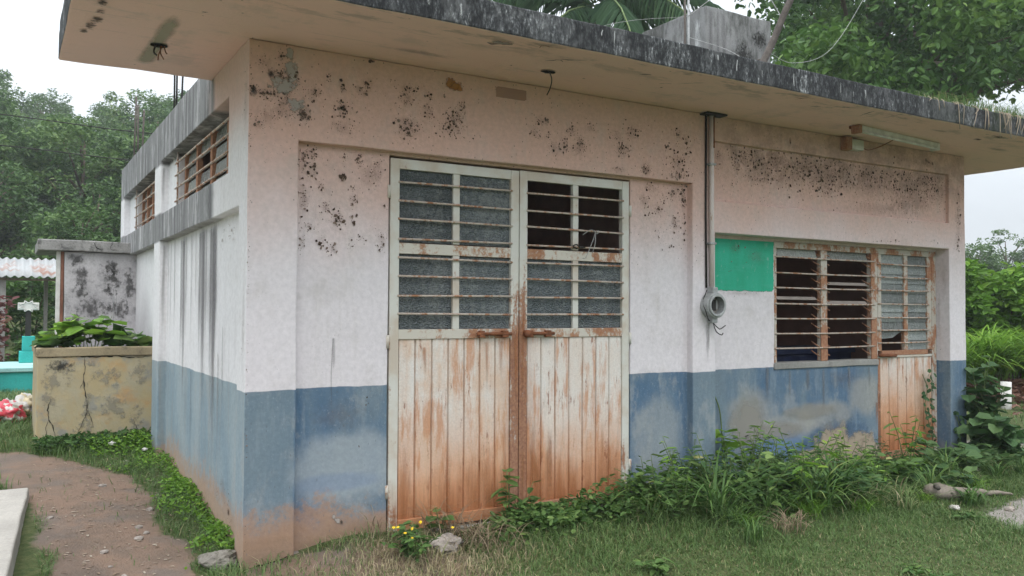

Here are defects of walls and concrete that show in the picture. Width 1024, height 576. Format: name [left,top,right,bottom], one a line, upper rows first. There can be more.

water stain [736,32,766,70]
water stain [68,255,135,321]
crack [45,355,149,435]
peeling [733,405,761,442]
peeling [796,423,878,467]